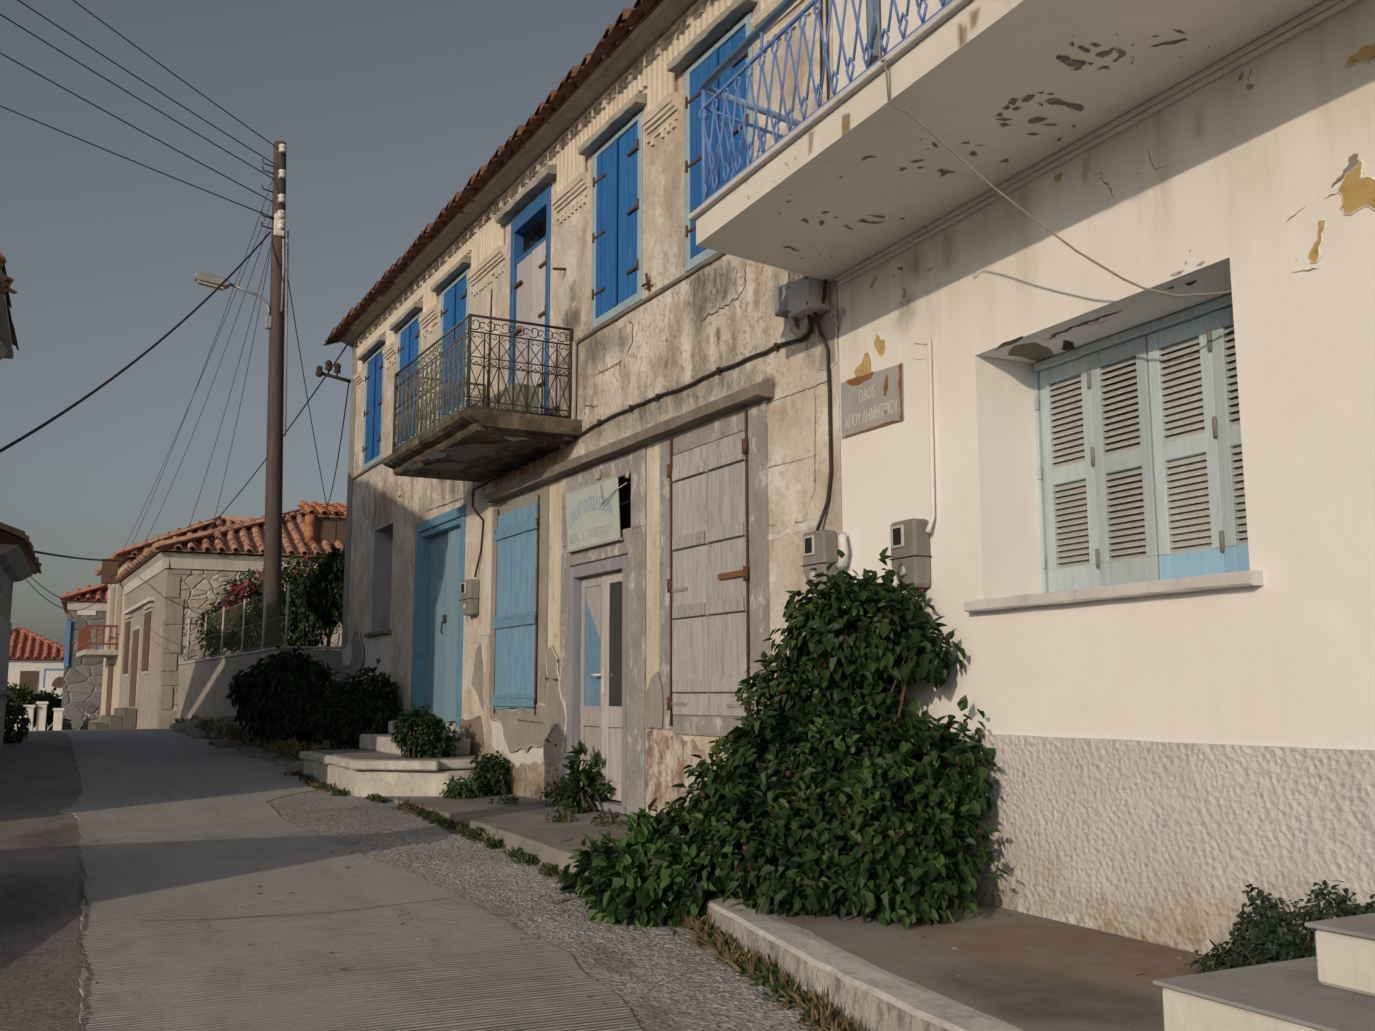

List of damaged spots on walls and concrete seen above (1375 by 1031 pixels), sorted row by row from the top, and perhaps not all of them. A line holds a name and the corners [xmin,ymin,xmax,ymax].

peeling [1056,34,1135,71]
peeling [1151,30,1187,58]
peeling [1344,43,1375,67]
peeling [996,91,1084,141]
peeling [899,139,955,178]
crack [1092,151,1173,199]
peeling [1331,153,1375,216]
peeling [802,212,905,230]
peeling [1308,219,1327,264]
peeling [854,332,887,377]
flaking render [461,640,567,769]
flaking render [645,728,704,810]